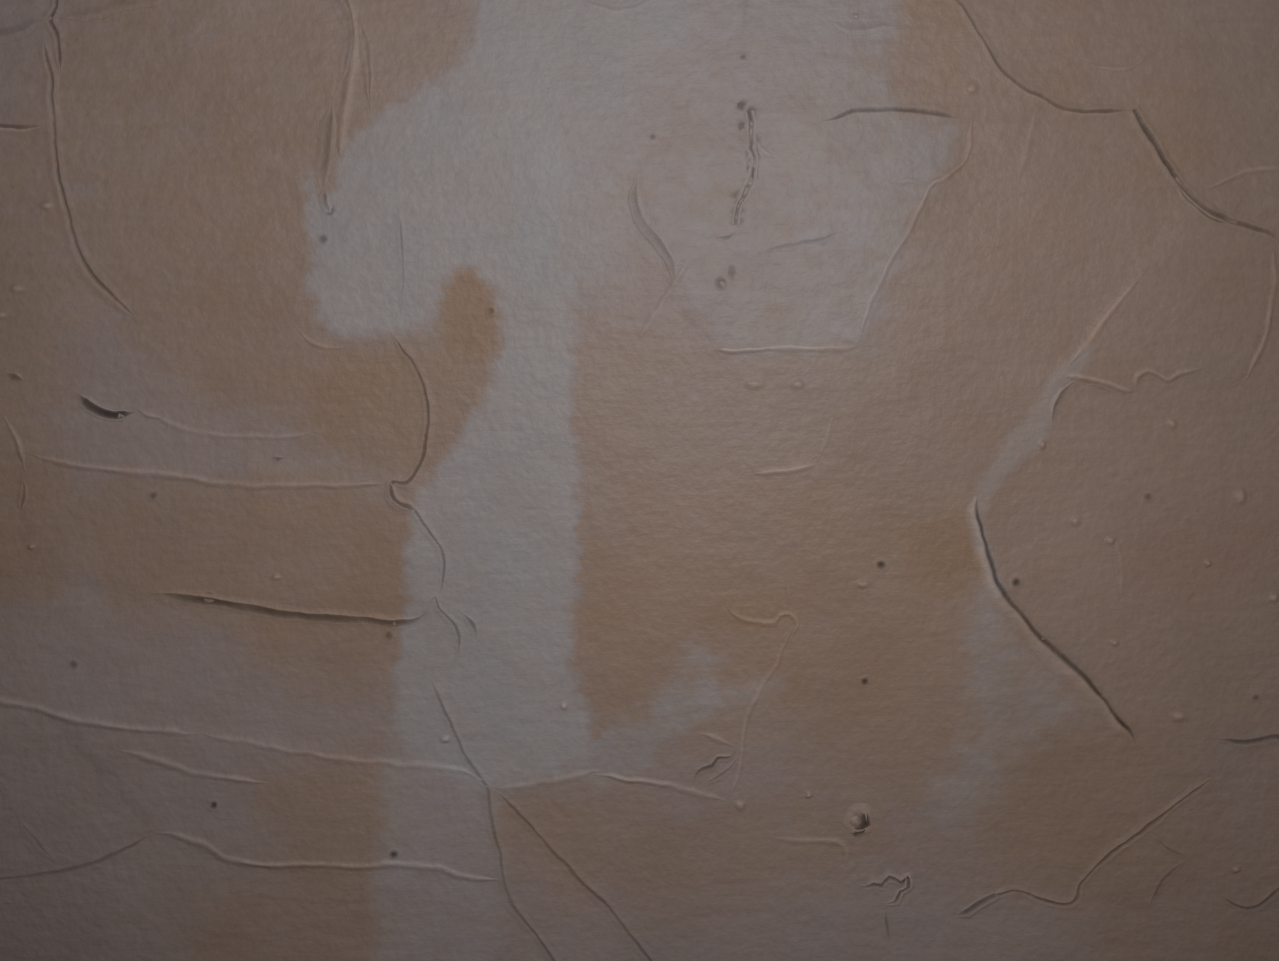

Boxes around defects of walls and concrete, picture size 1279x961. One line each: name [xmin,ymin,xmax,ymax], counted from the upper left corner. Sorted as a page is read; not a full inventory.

crack [710,98,774,296]
crack [817,100,966,125]
crack [946,0,1279,243]
crack [1212,727,1279,751]